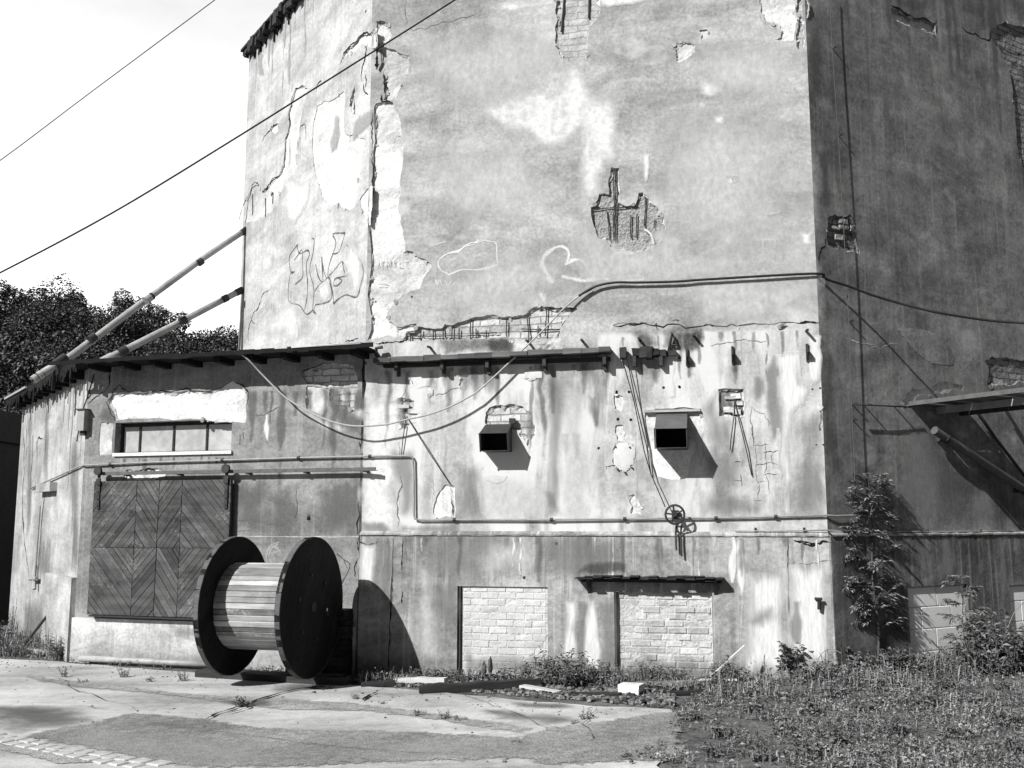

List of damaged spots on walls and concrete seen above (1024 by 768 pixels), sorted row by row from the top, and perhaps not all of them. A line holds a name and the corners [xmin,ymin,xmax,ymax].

flaking render [554,0,601,63]
crack [239,80,321,219]
flaking render [313,22,576,350]
spalling [591,168,666,252]
leakage [249,390,310,445]
flaking render [302,363,358,415]
leakage [318,388,426,596]
flaking render [485,404,536,448]
leakage [489,383,584,514]
crack [734,407,778,501]
leakage [487,538,530,575]
leakage [421,571,435,656]